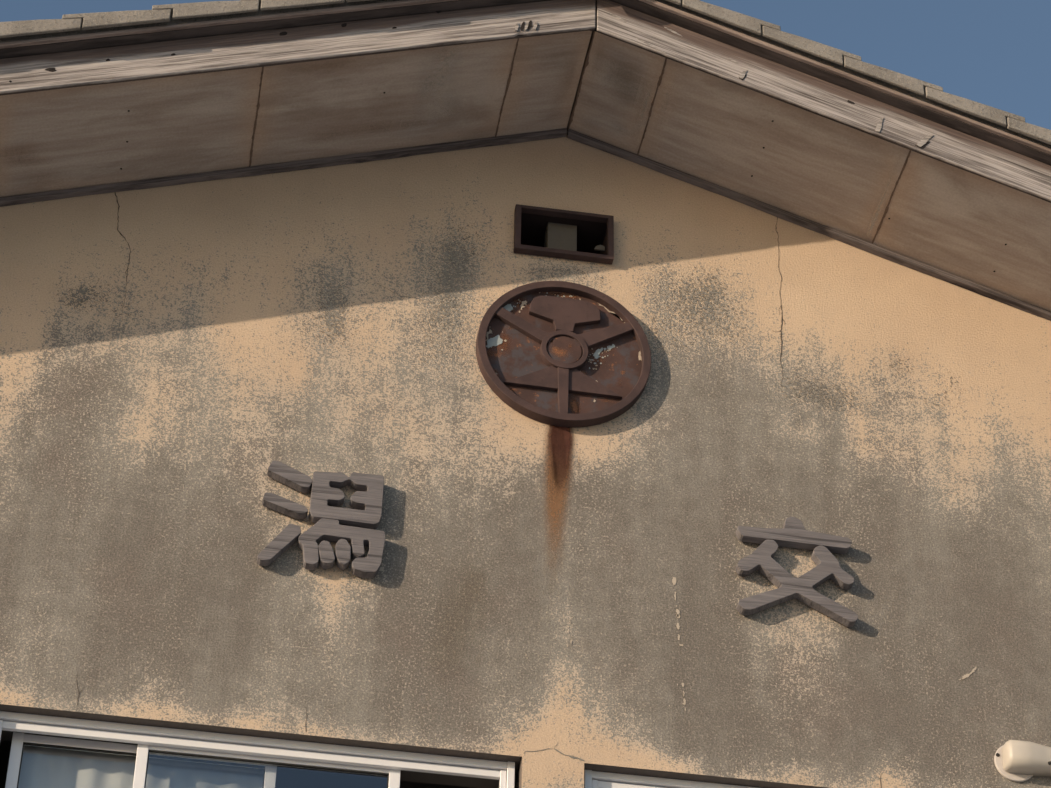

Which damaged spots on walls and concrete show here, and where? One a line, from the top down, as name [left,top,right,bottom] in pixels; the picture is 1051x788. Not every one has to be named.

damp [57,277,142,318]
crack [115,193,131,321]
damp [308,272,356,351]
damp [417,220,488,387]
damp [643,265,748,370]
crack [774,217,785,383]
damp [773,371,871,416]
corrosion [546,425,573,536]